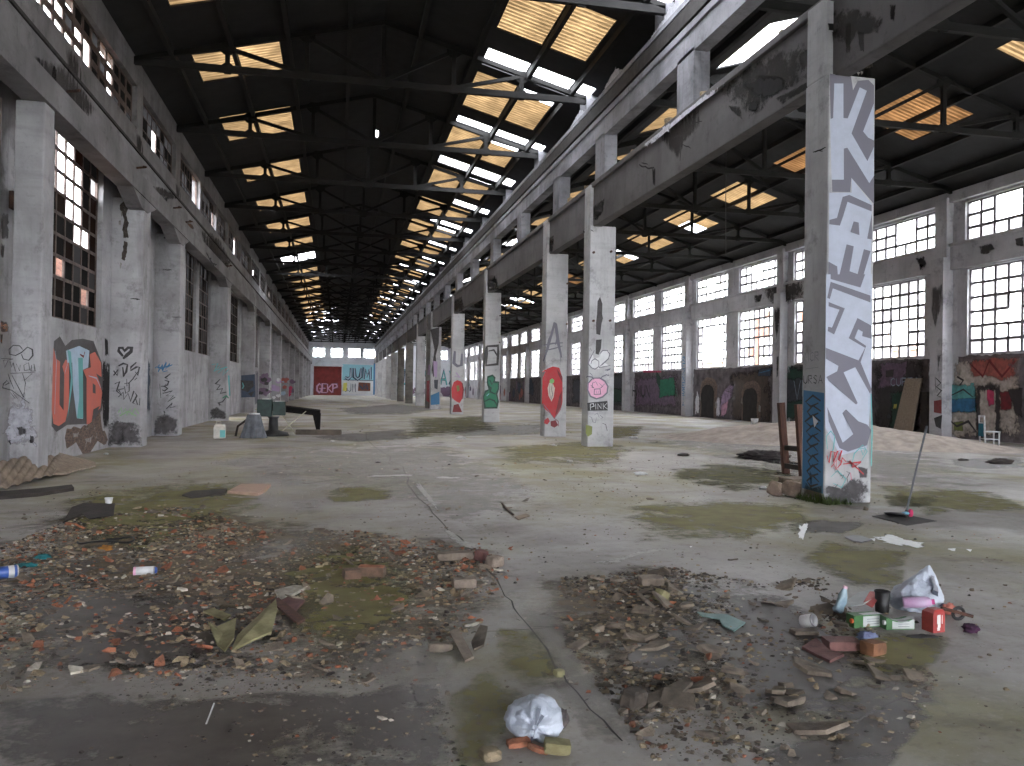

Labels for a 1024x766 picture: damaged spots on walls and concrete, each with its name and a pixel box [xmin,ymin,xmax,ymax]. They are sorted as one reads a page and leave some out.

water stain [828,5,895,52]
water stain [722,46,808,116]
spalling [119,201,129,268]
water stain [108,421,141,446]
water stain [154,412,177,435]
water stain [826,467,868,503]
crack [366,432,623,741]